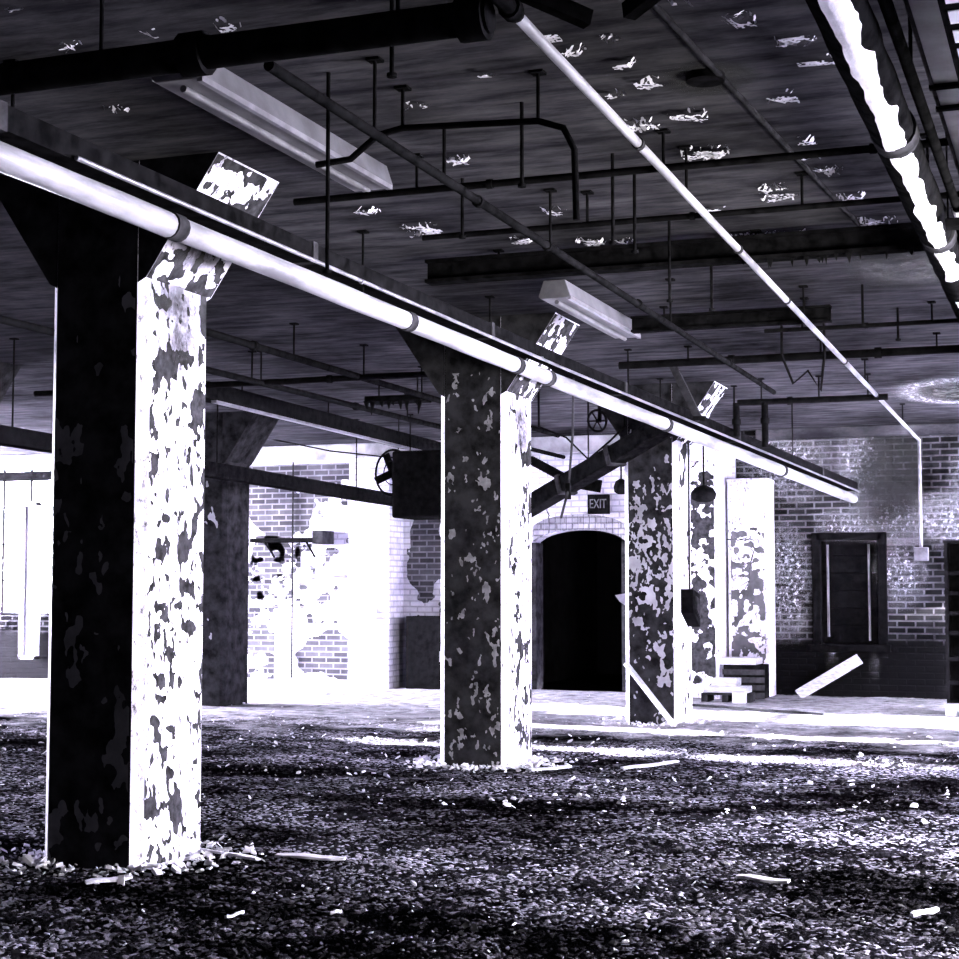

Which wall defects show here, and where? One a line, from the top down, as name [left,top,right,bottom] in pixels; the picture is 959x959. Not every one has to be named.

peeling [624,108,708,133]
peeling [680,145,729,161]
peeling [185,258,225,339]
peeling [149,333,195,442]
peeling [177,381,218,601]
peeling [250,463,349,484]
peeling [677,437,715,559]
peeling [248,484,330,679]
peeling [628,495,673,611]
peeling [691,562,716,685]
peeling [731,557,766,664]
peeling [144,765,187,837]